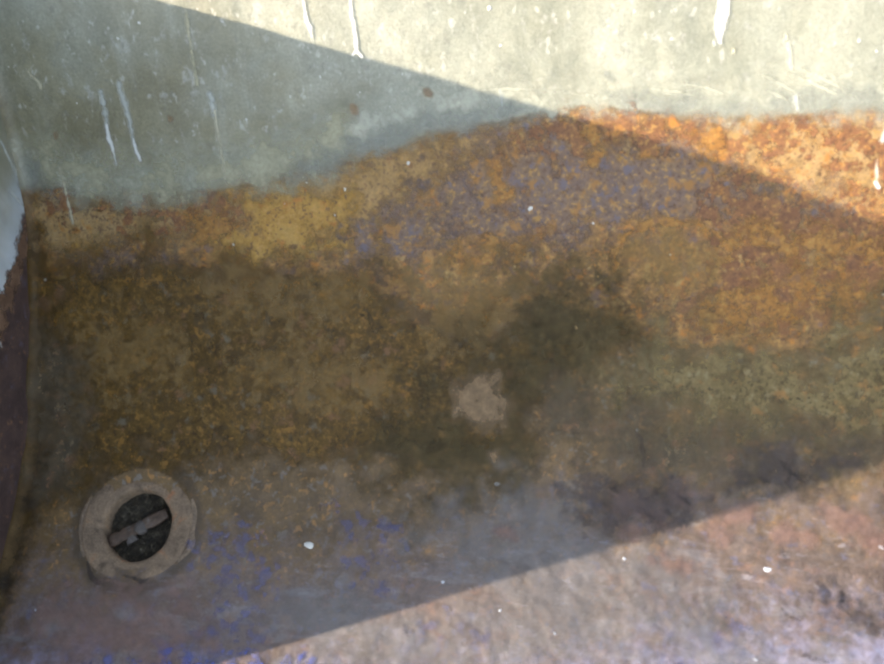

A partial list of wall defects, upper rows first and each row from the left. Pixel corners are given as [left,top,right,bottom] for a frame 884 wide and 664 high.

water stain [0,68,565,222]
water stain [758,59,884,111]
corrosion [0,100,884,613]